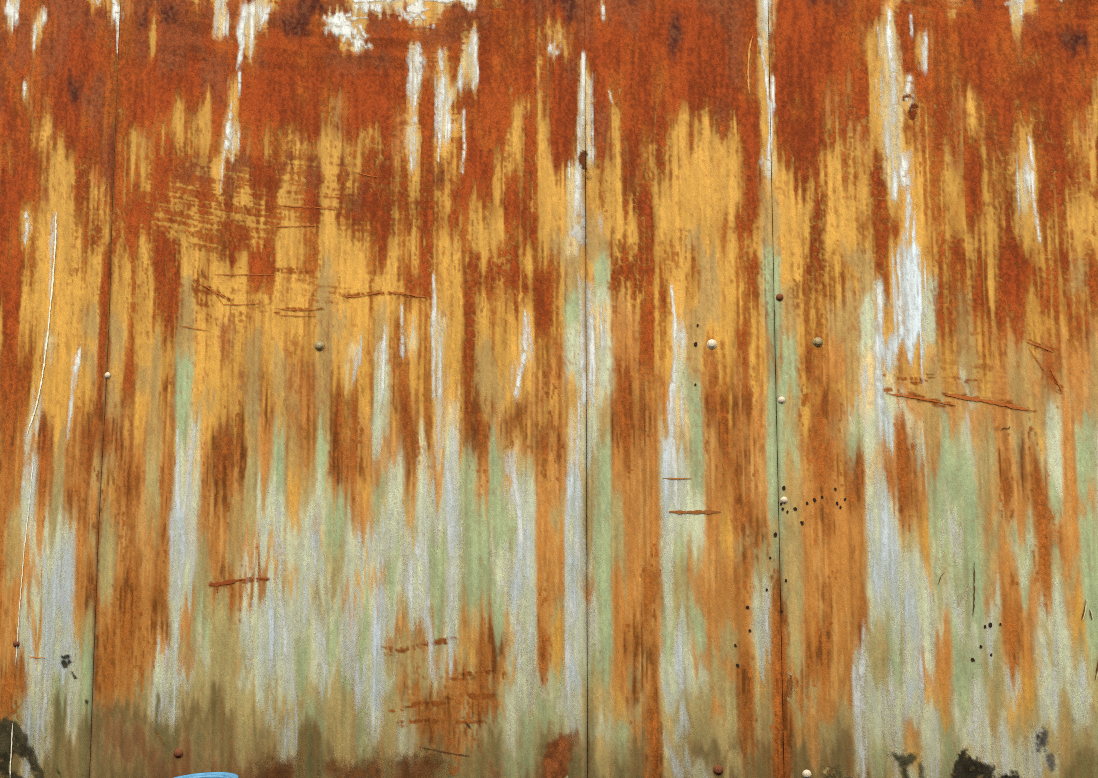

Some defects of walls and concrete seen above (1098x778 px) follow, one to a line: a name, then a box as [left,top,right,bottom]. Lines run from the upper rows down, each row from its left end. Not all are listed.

peeling [323,0,476,51]
rust [883,0,1098,407]
rust [0,0,899,690]
rust [890,420,919,532]
rust [998,427,1061,607]
rust [0,656,44,717]
rust [389,618,505,778]
rust [544,735,572,778]
rust [624,544,663,778]
rust [737,658,757,763]
rust [770,569,833,778]